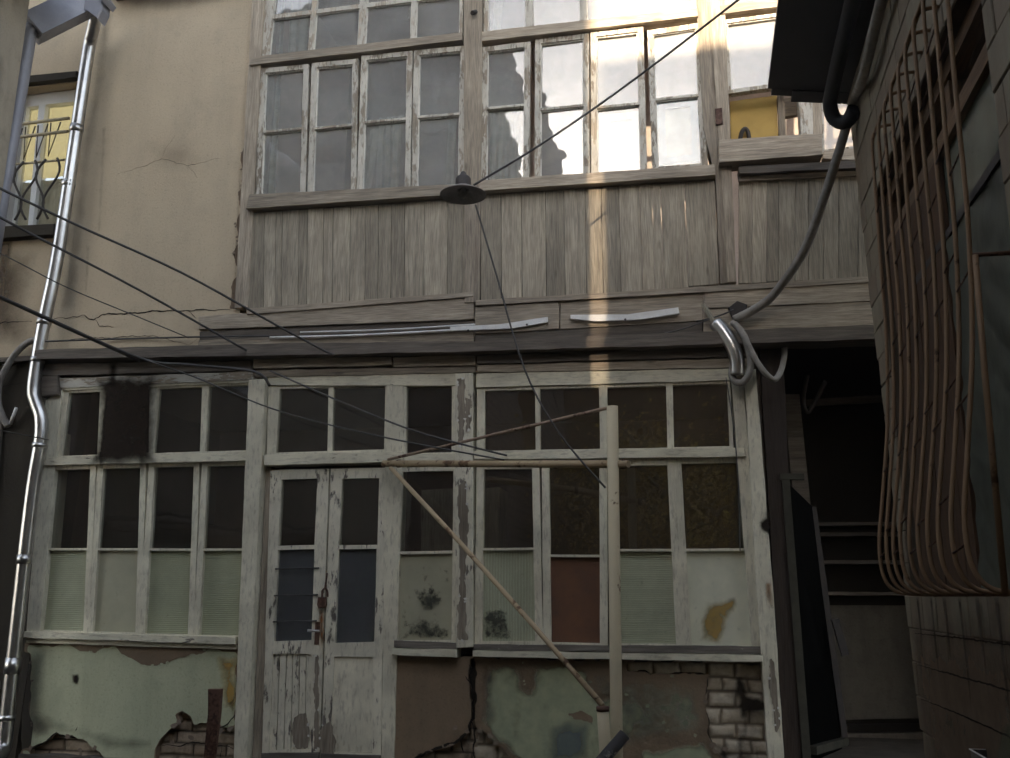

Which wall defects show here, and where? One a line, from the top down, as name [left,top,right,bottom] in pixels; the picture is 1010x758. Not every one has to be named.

crack [0,309,230,345]
peeling [75,644,104,653]
peeling [116,640,238,666]
spalling [21,658,102,756]
crack [415,665,476,758]
spalling [626,659,782,758]
spalling [159,712,207,758]
spalling [216,724,235,758]
spalling [420,719,509,758]